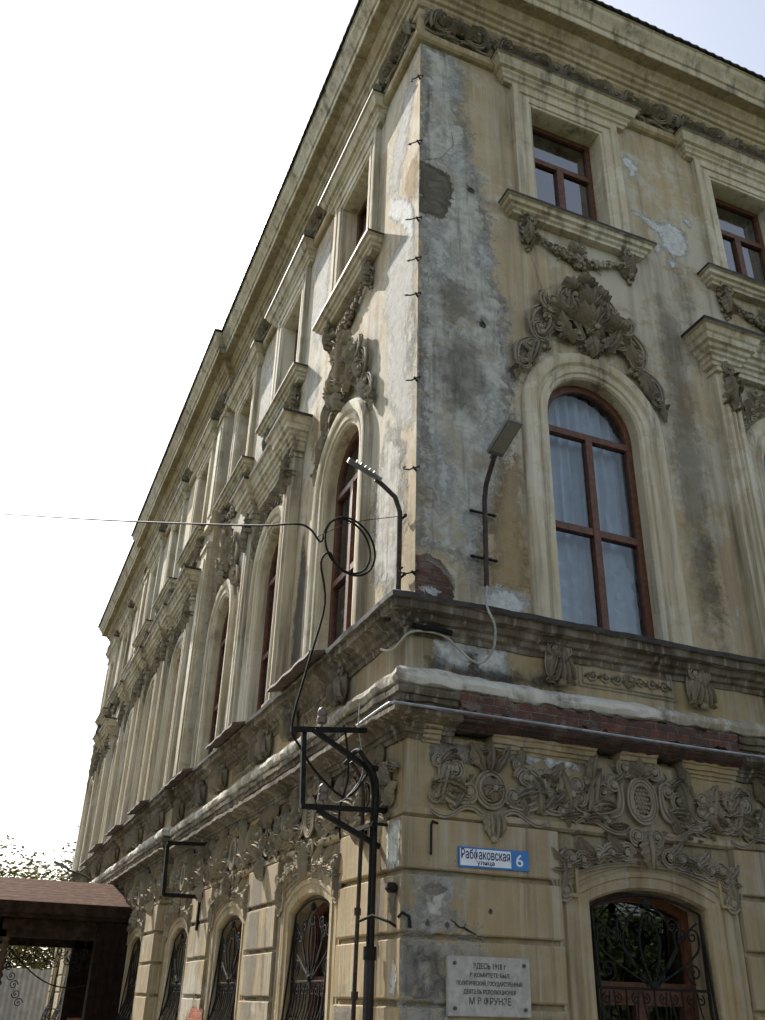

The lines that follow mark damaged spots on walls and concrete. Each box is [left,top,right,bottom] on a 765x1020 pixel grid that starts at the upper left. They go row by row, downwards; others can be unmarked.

peeling [629,209,693,269]
peeling [369,43,531,613]
peeling [432,639,512,677]
spalling [429,690,743,785]
peeling [385,819,401,870]
peeling [388,872,486,1020]
spalling [186,1006,203,1020]